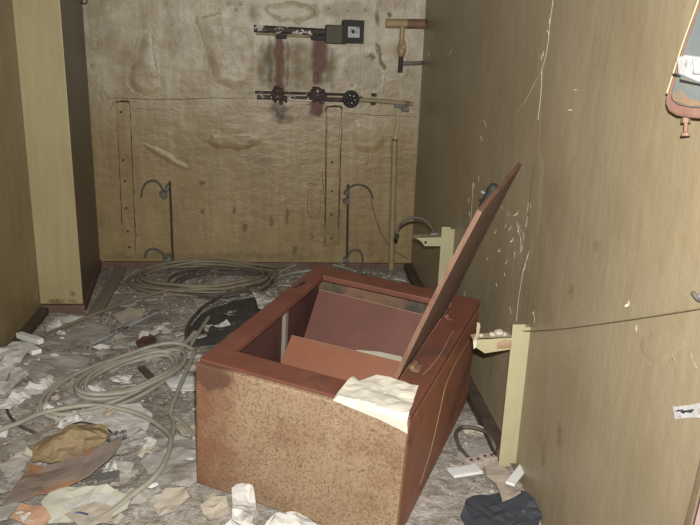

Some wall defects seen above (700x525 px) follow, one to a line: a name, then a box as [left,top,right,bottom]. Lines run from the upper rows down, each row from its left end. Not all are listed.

rust [265,39,288,90]
rust [312,40,327,83]
crack [519,2,553,116]
rust [310,101,323,116]